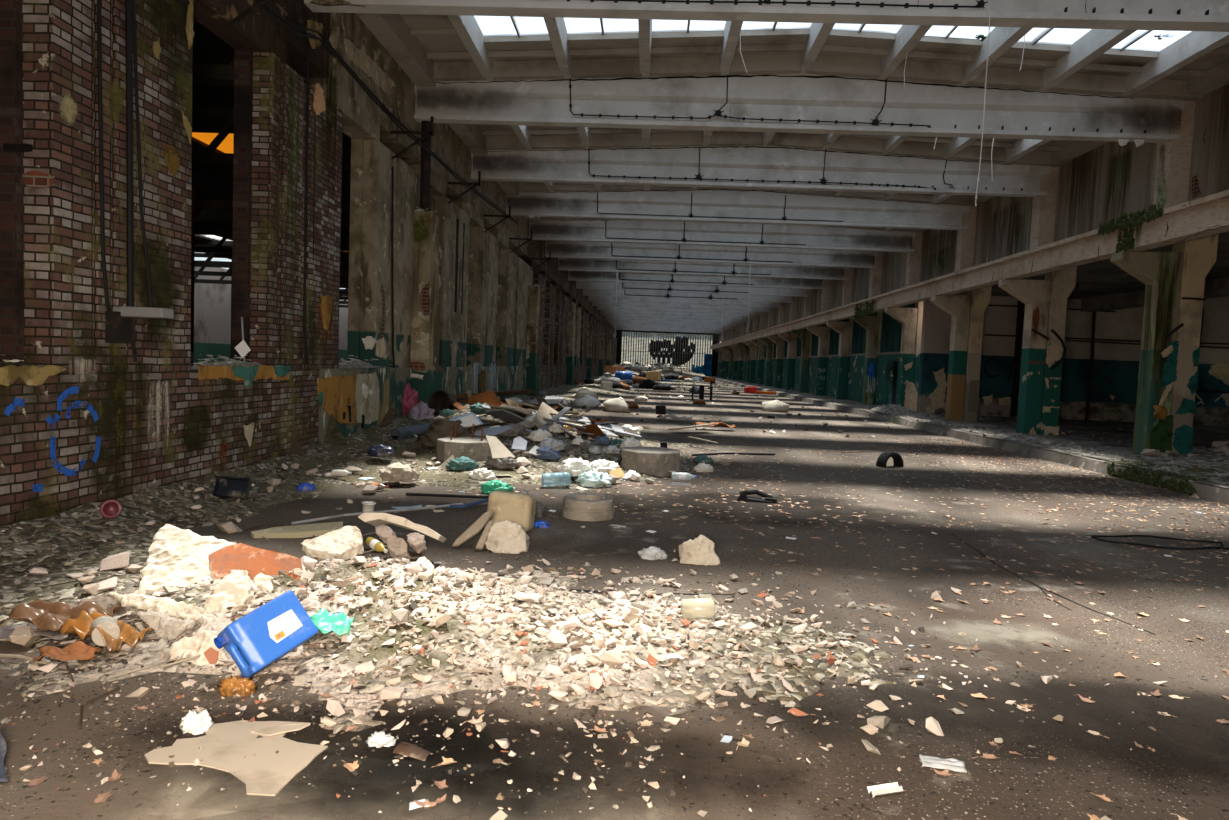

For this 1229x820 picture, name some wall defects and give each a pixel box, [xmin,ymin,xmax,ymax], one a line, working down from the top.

flaking render [313,83,326,115]
flaking render [0,359,66,386]
flaking render [190,355,290,386]
flaking render [317,285,391,429]
peeling [1029,344,1063,435]
peeling [1149,341,1229,454]